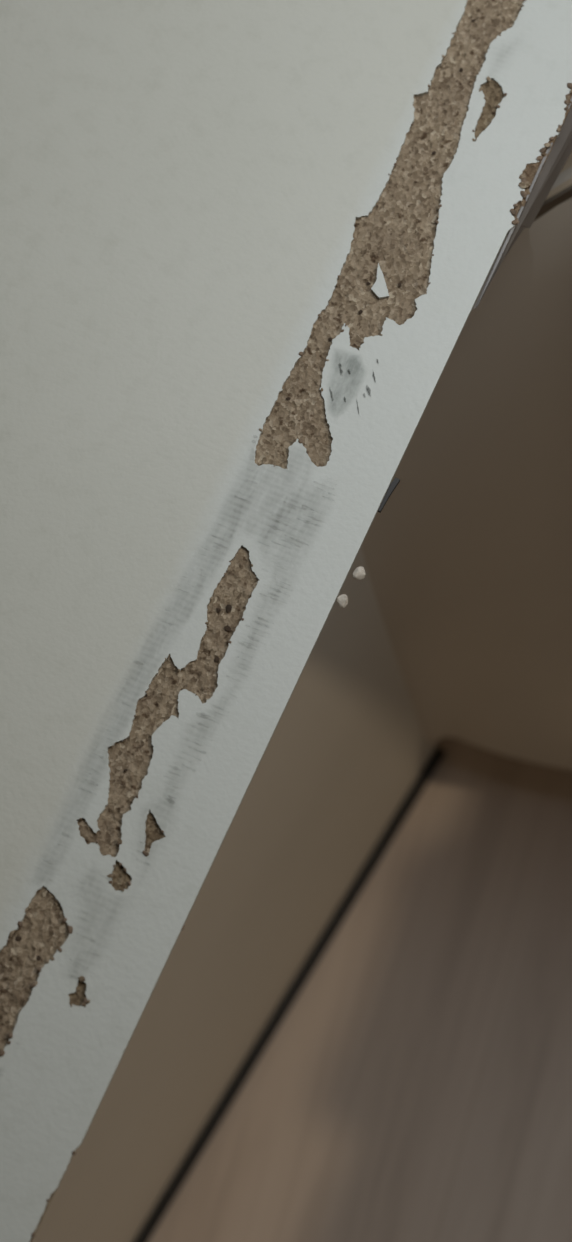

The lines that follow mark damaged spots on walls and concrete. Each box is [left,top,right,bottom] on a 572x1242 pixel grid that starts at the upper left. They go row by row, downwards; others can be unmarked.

peeling [255,0,526,469]
spalling [510,83,572,225]
peeling [77,546,259,891]
peeling [0,886,73,1056]
peeling [69,976,90,1007]